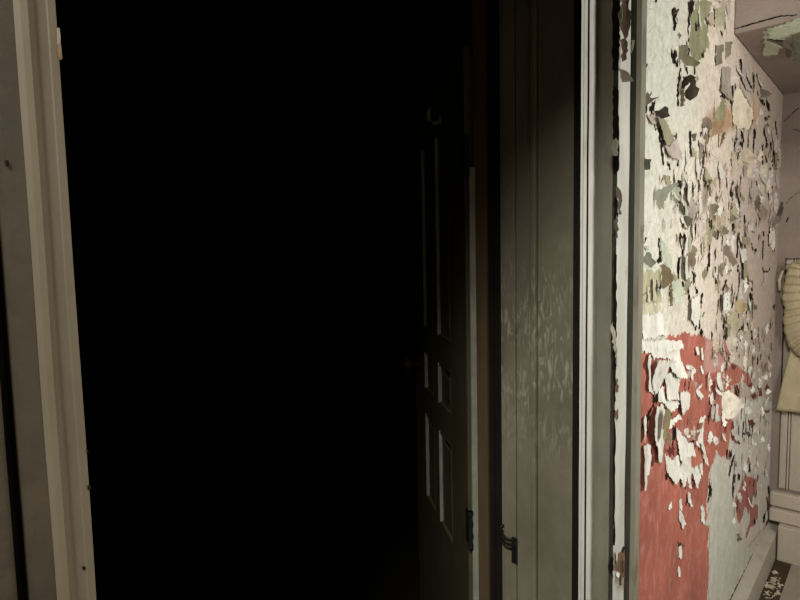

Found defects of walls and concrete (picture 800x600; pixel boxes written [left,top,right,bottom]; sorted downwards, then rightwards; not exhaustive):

peeling [612,0,635,174]
peeling [762,17,800,63]
peeling [613,186,622,238]
peeling [642,0,789,600]
peeling [608,251,625,585]